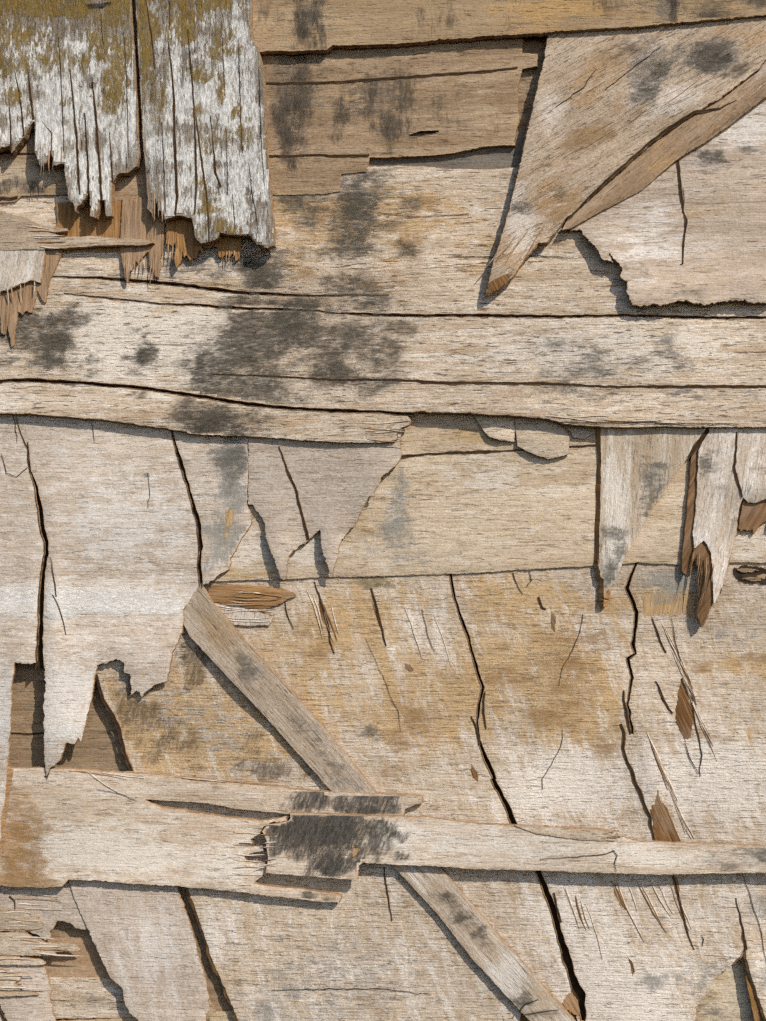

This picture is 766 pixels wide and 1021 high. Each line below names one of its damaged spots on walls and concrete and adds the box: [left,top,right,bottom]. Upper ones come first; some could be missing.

peeling [0,1,273,245]
water stain [278,168,395,260]
water stain [0,305,89,369]
water stain [164,247,415,569]
crack [1,416,66,669]
peeling [0,586,186,619]
crack [170,431,203,587]
spalling [733,564,766,584]
crack [449,574,518,824]
crack [620,563,703,839]
water stain [267,791,409,877]
crack [534,849,618,1021]